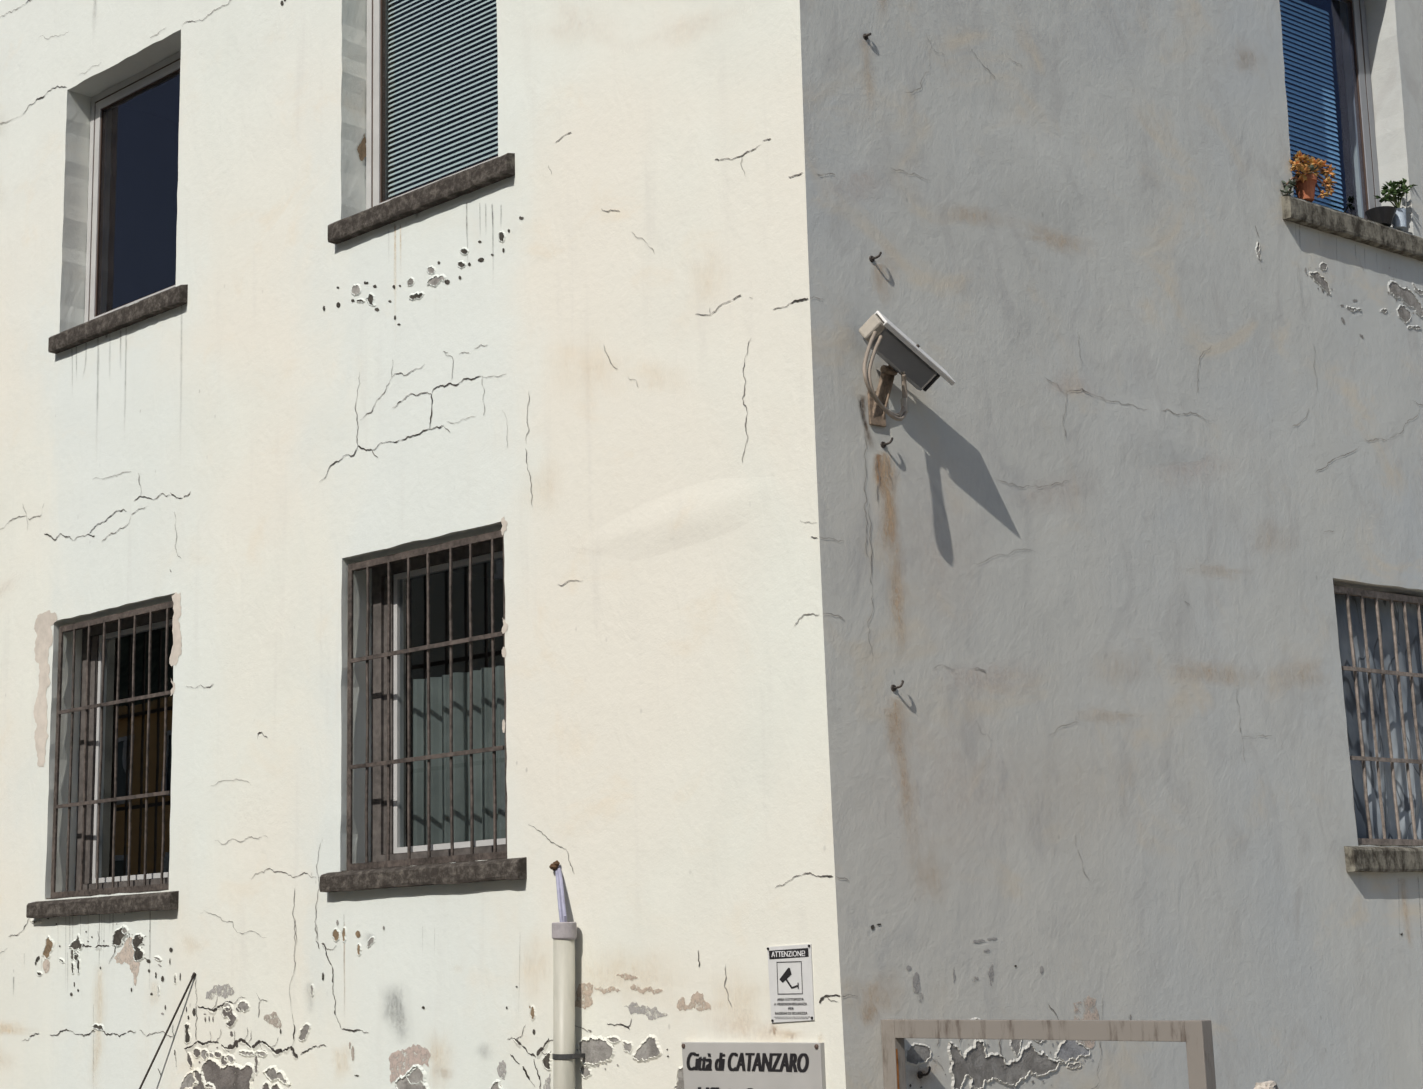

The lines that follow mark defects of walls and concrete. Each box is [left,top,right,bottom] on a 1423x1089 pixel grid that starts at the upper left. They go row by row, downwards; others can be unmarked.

flaking render [30,913,181,1015]
flaking render [180,984,291,1089]
flaking render [298,1022,312,1043]